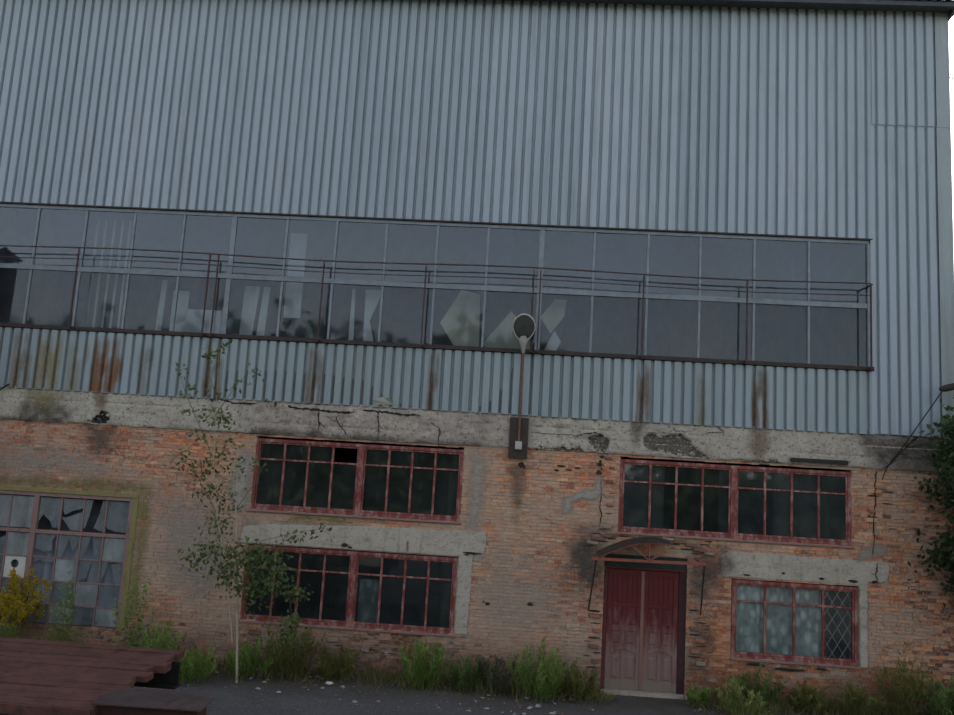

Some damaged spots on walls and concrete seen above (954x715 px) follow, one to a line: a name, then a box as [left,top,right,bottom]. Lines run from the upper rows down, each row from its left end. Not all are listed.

spalling [87,411,112,424]
crack [288,405,441,442]
rust [752,372,768,428]
spalling [643,434,713,459]
spalling [538,433,636,547]